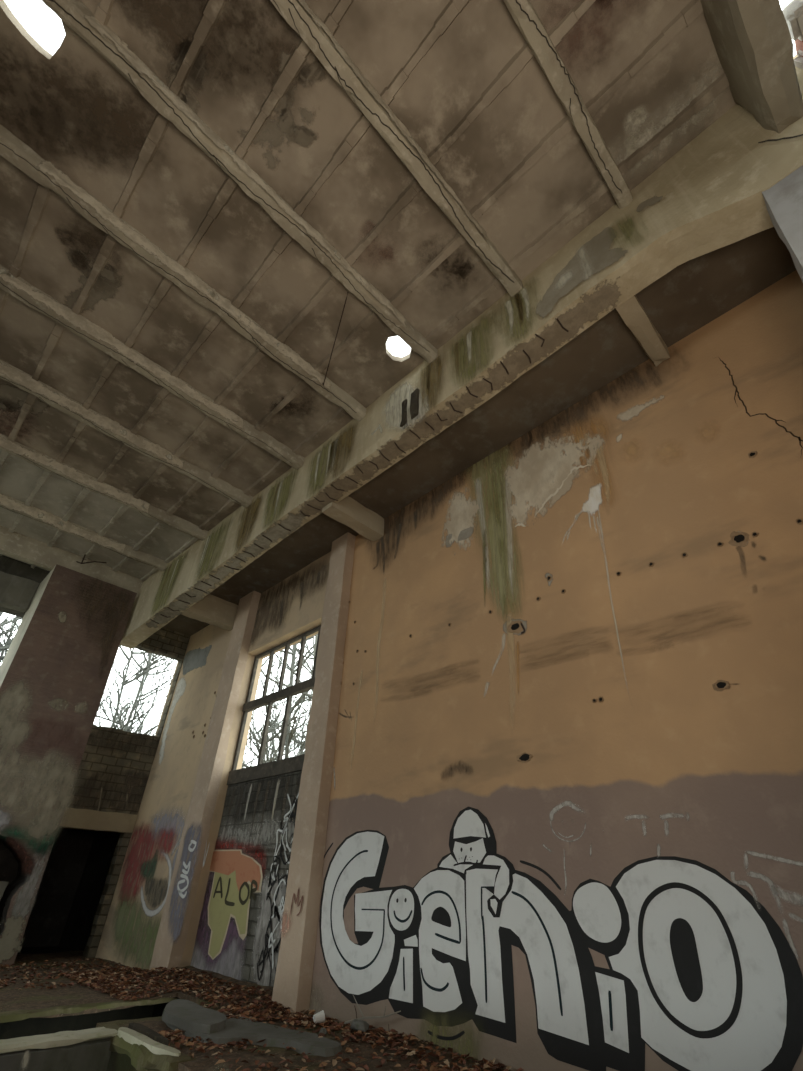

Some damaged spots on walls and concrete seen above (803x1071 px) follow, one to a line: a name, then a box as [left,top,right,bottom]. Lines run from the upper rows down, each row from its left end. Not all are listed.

crack [758,134,803,143]
damp [315,425,356,477]
spalling [146,227,628,628]
crack [715,357,803,458]
damp [236,478,287,548]
damp [370,360,659,692]
damp [250,565,327,644]
spalling [503,619,527,636]
flaking render [0,682,75,963]